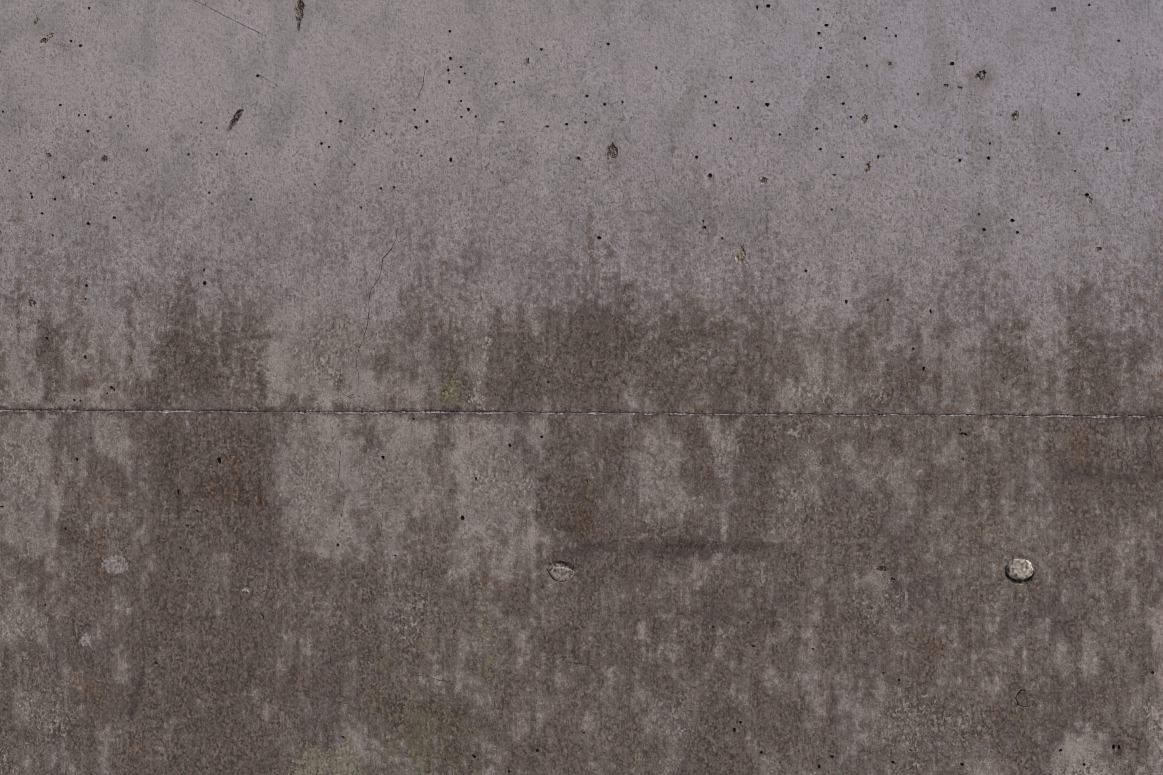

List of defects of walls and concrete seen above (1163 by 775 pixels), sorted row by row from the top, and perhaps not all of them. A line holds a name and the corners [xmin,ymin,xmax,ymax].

leakage [109,295,297,775]
crack [344,228,398,397]
leakage [487,284,807,775]
leakage [1058,321,1100,411]